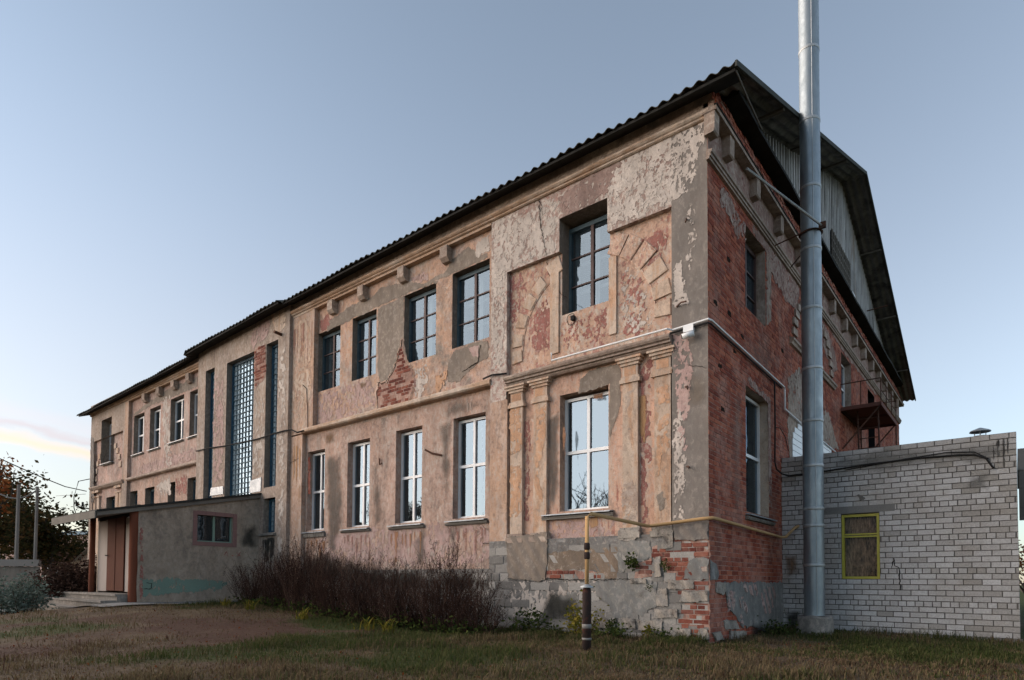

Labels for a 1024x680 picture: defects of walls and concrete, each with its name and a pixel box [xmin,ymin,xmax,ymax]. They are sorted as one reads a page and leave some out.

peeling [475,121,705,372]
flaking render [250,310,448,555]
flaking render [509,333,711,642]
flaking render [724,581,784,629]